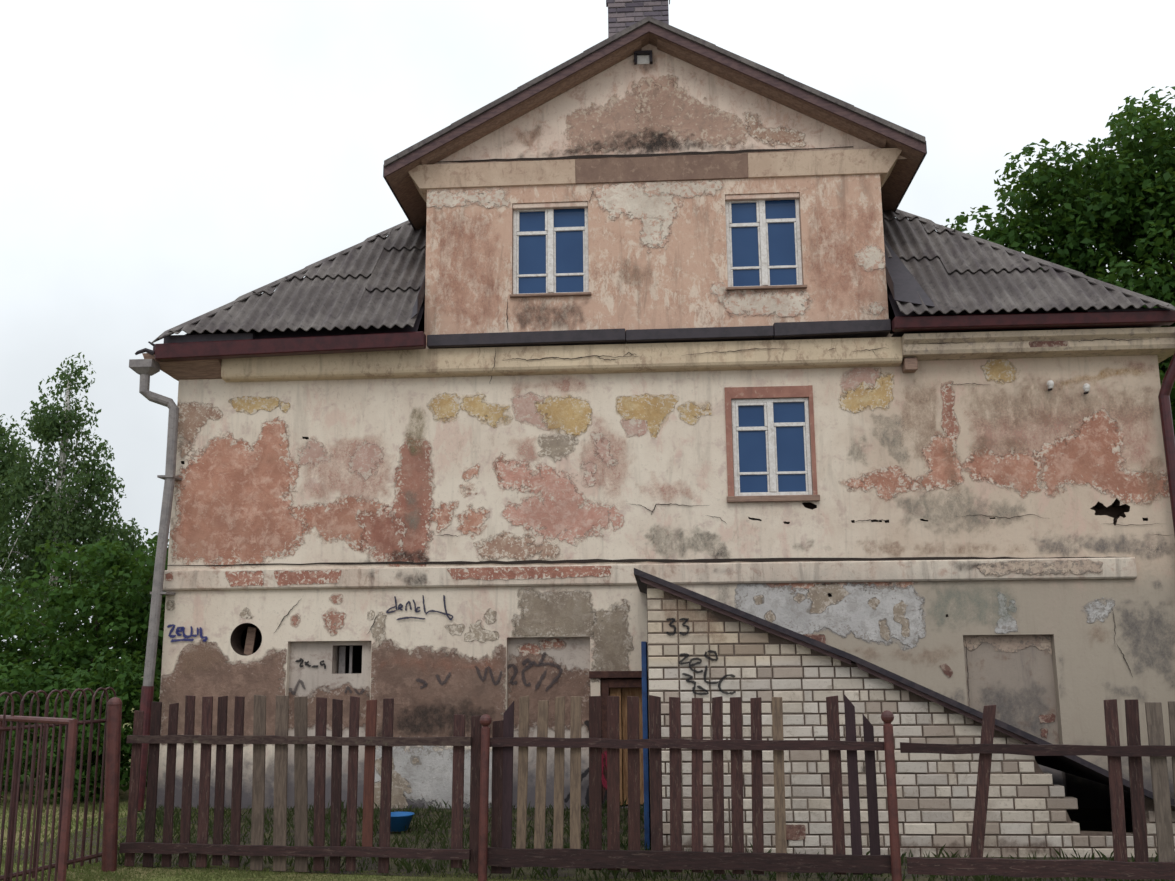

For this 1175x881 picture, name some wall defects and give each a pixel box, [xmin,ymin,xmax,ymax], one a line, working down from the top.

damp [591,132,710,154]
peeling [565,74,806,155]
crack [490,299,638,381]
peeling [617,393,713,439]
peeling [838,367,894,413]
peeling [839,382,1170,526]
crack [632,503,727,524]
peeling [160,392,634,808]
peeling [735,582,926,650]